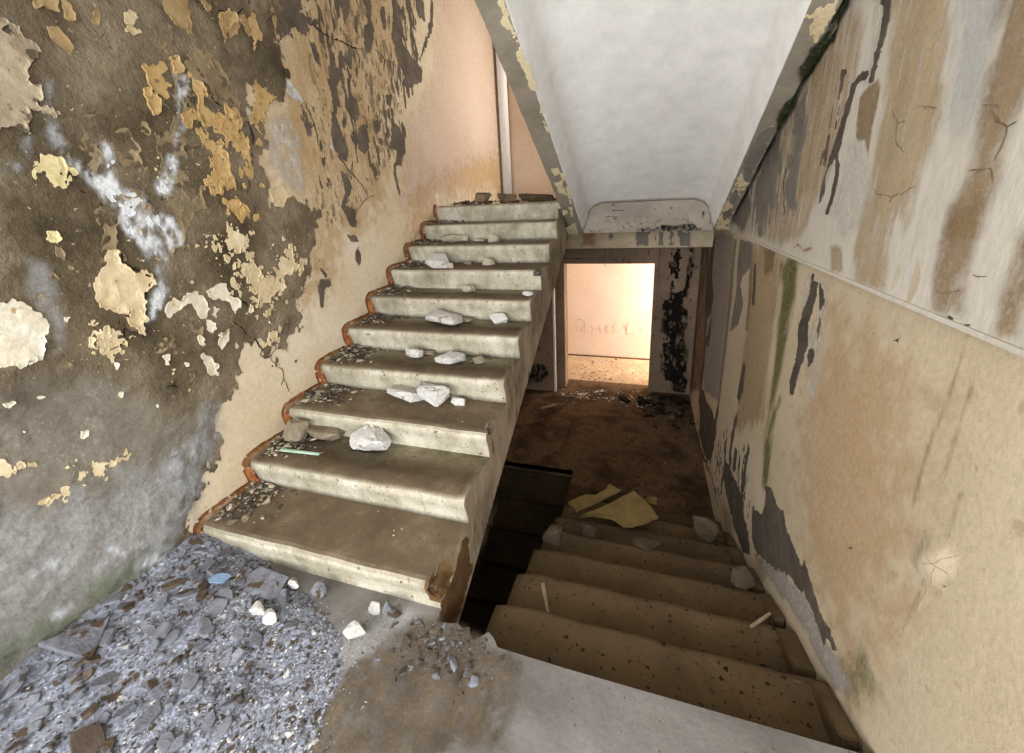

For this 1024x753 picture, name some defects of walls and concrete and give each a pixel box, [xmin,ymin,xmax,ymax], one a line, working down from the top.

peeling [498,0,550,134]
peeling [802,0,839,68]
peeling [819,0,891,215]
crack [892,106,937,151]
crack [969,104,1017,182]
efflorescence [75,144,183,260]
efflorescence [150,281,165,319]
peeling [0,0,433,681]
crack [217,271,289,391]
peeling [551,88,837,651]
crack [915,541,959,613]